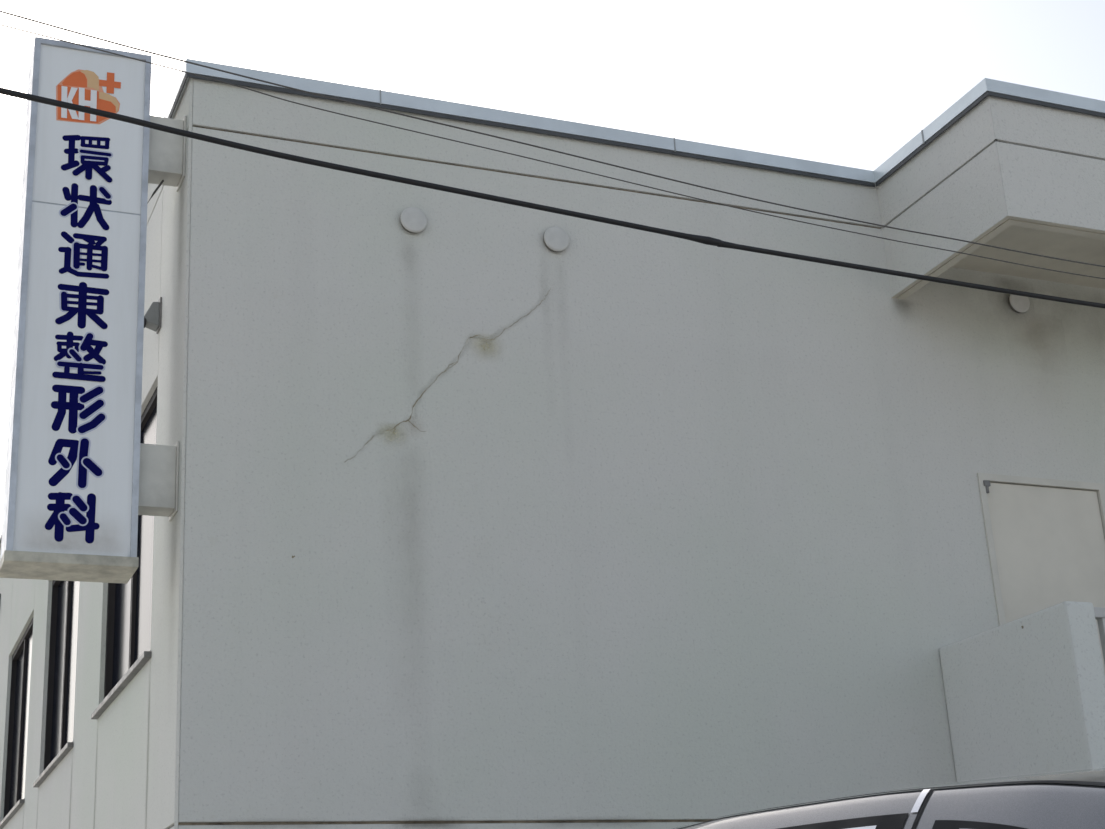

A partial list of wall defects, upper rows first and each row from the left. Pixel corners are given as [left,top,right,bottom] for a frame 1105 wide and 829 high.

crack [344,290,550,463]